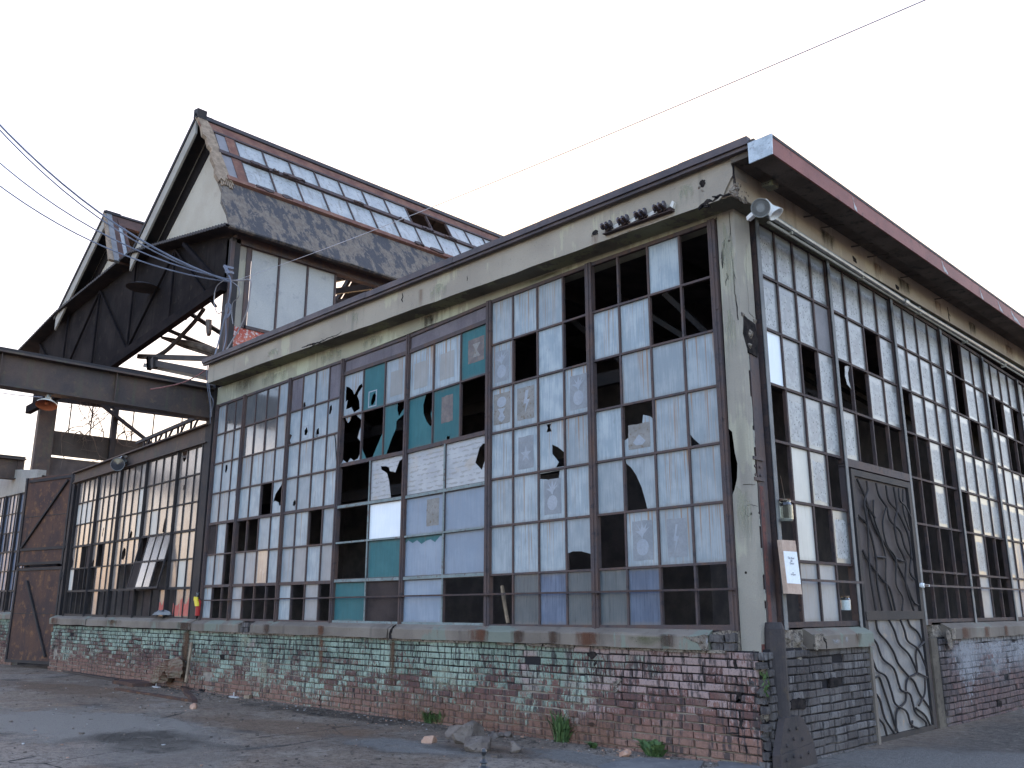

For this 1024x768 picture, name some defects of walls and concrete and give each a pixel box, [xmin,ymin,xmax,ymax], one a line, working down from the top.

crack [698,164,739,320]